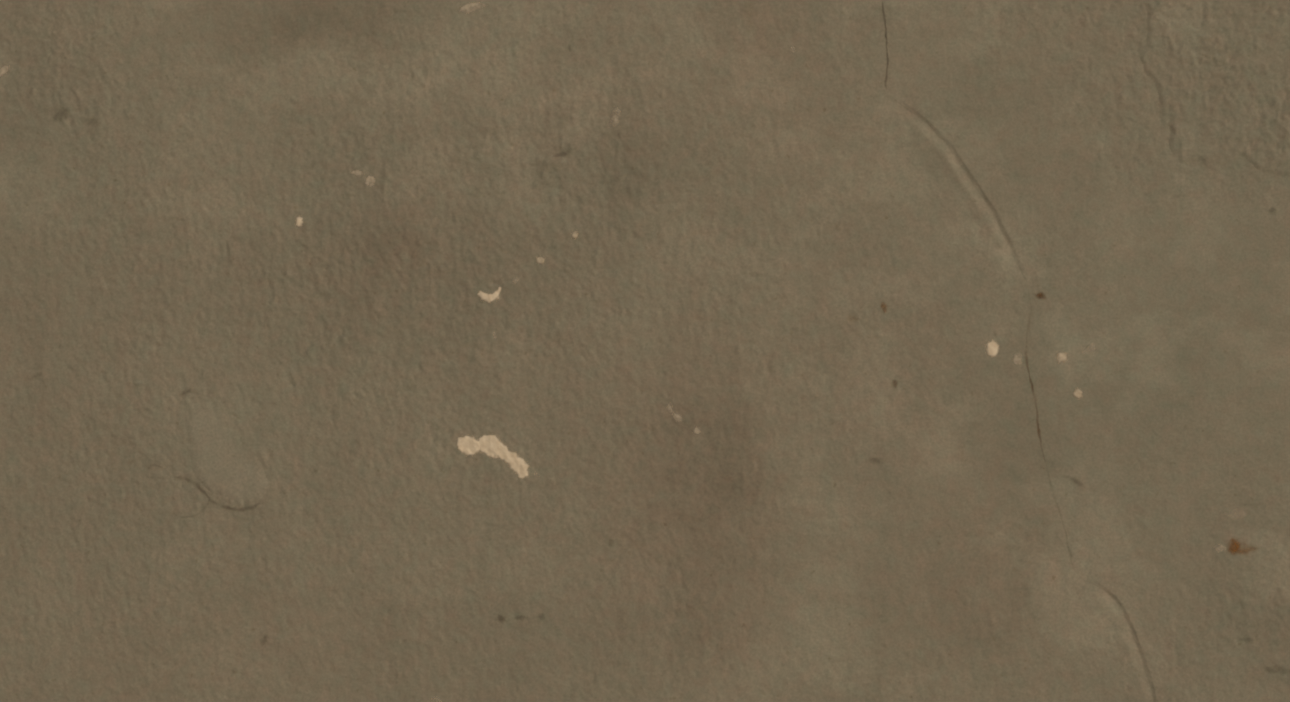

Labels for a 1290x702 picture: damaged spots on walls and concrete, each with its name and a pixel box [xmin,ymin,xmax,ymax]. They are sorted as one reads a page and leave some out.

spalling [478,287,501,303]
spalling [457,435,529,478]